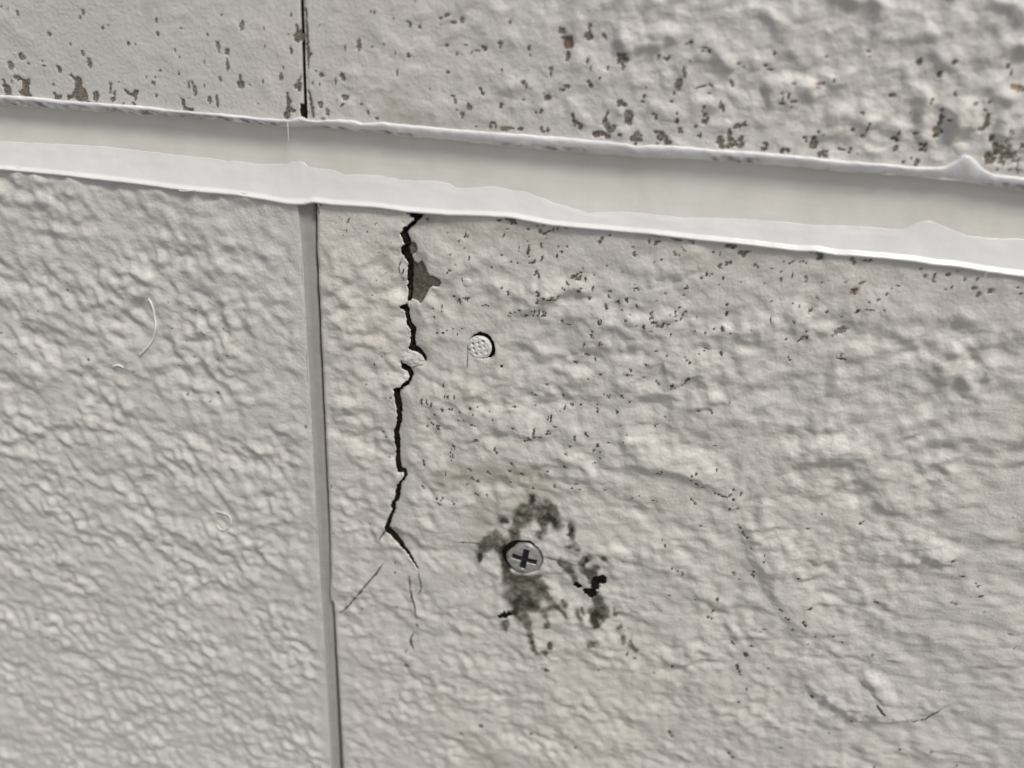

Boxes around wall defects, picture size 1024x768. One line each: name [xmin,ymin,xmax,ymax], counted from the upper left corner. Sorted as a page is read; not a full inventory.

peeling [409,242,455,319]
crack [340,213,427,653]
leakage [477,495,638,656]